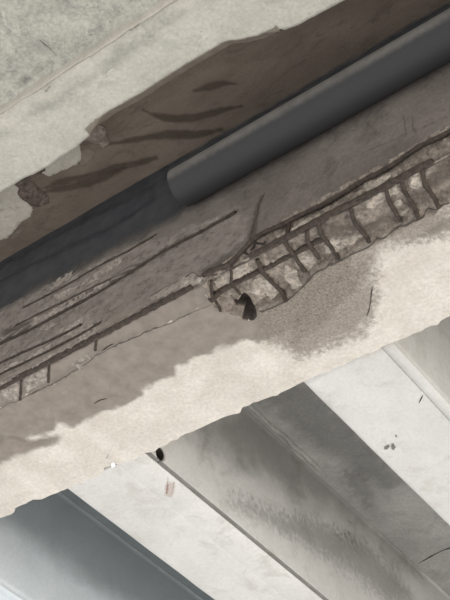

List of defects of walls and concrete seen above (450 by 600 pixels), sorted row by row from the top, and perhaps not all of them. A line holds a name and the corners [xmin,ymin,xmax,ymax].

water stain [0,273,274,462]
water stain [0,4,450,310]
spalling [0,124,450,408]